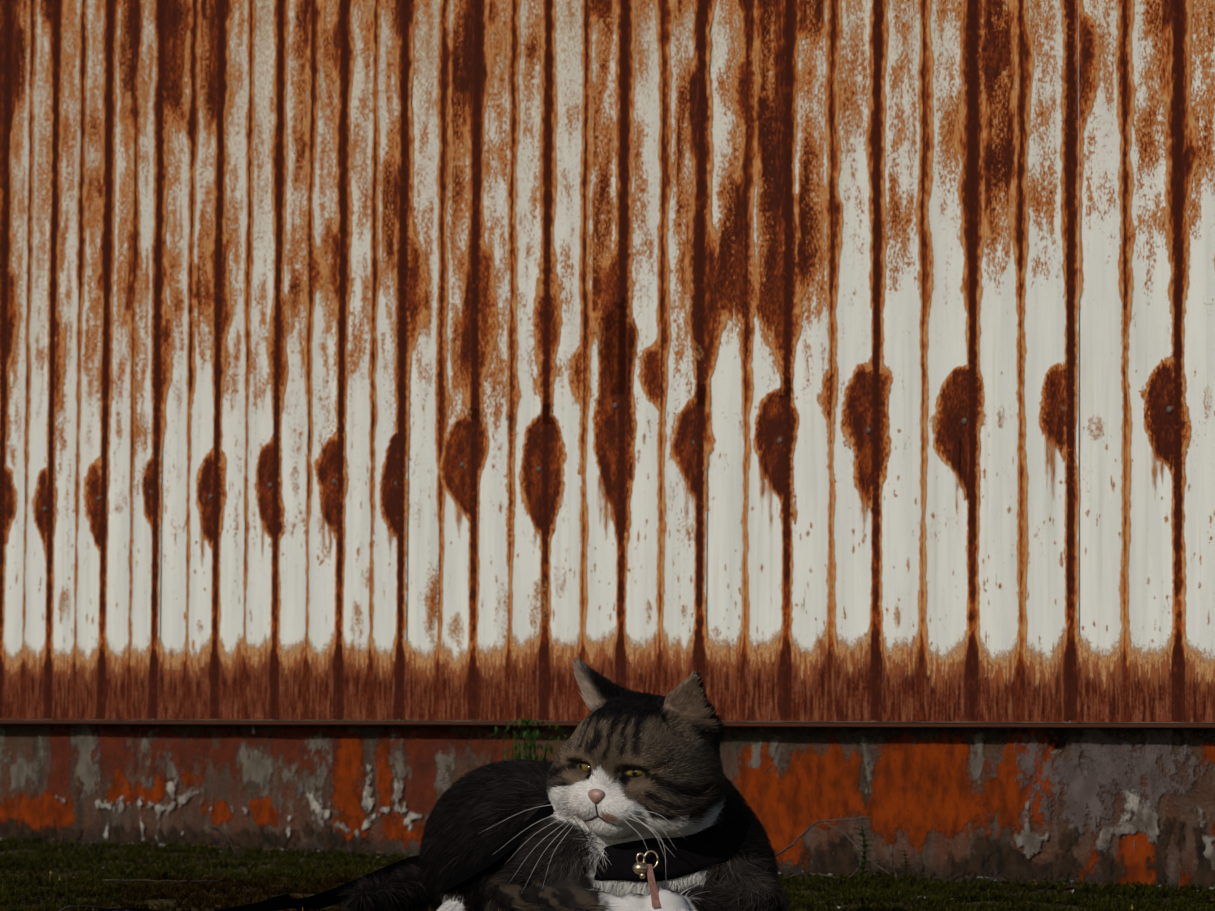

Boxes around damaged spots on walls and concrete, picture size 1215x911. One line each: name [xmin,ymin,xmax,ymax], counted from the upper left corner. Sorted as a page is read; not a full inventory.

rust [0,0,1215,722]
rust [732,729,1064,875]
peeling [1014,801,1049,859]
peeling [1091,803,1159,852]
peeling [1198,807,1215,870]